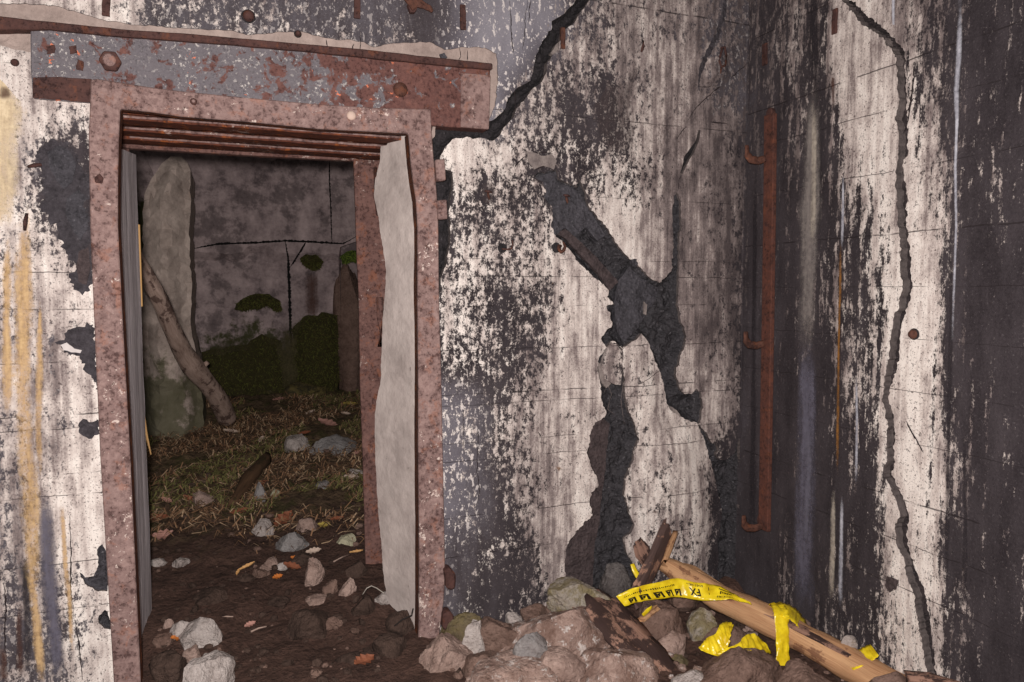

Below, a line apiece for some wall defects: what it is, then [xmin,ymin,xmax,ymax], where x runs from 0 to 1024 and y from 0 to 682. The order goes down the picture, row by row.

rust [69,45,84,71]
peeling [35,138,93,295]
peeling [55,322,97,390]
peeling [78,419,99,439]
spalling [79,544,108,591]
crack [463,406,480,504]
crack [432,0,589,294]
leakage [796,363,815,592]
leakage [802,106,821,323]
efflorescence [830,502,843,597]
crack [842,0,937,675]
leakage [945,21,961,554]